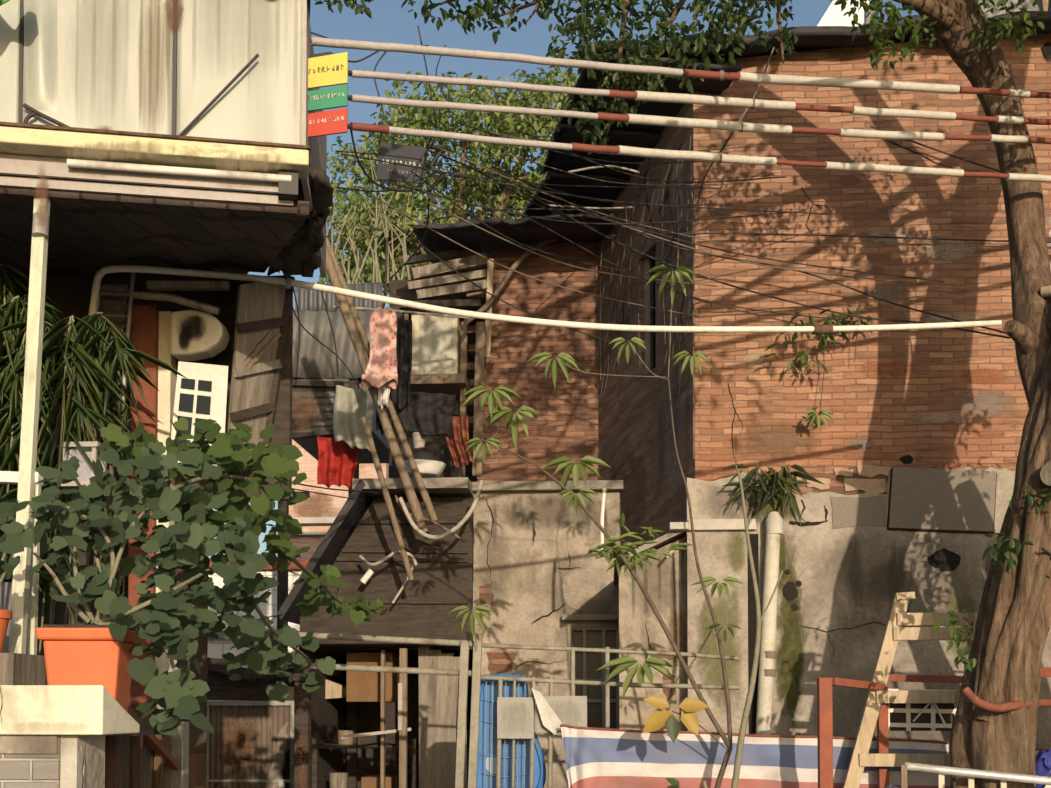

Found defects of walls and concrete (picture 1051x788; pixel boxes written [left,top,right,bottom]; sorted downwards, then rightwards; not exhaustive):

corrosion [167,0,183,27]
spalling [779,464,891,495]
crack [531,603,581,624]
damp [782,581,800,706]
crack [803,622,903,663]